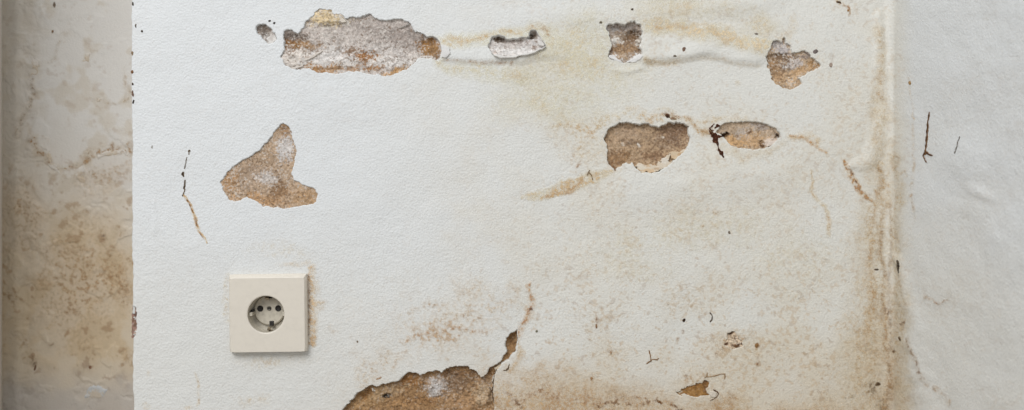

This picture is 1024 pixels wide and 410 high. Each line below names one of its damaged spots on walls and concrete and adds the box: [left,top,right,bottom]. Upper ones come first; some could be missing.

flaking render [257,9,450,76]
flaking render [606,22,643,63]
flaking render [766,38,833,90]
crack [181,150,191,196]
flaking render [220,123,318,209]
flaking render [604,117,689,173]
flaking render [716,122,779,150]
crack [922,112,960,162]
flaking render [343,330,517,410]
water stain [493,378,682,410]
flaking render [676,380,716,397]
water stain [854,294,920,410]